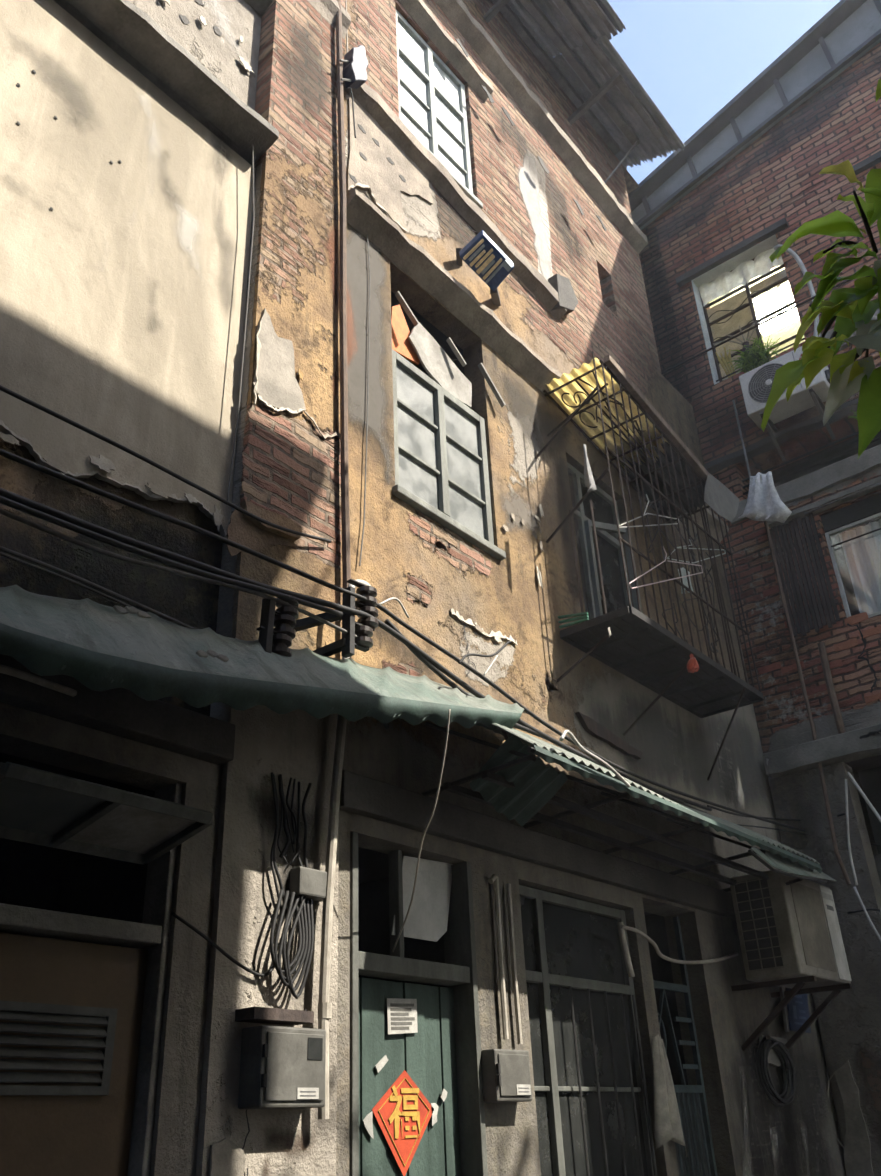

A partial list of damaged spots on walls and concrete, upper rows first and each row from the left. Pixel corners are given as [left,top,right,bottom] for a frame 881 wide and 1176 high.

peeling [162,0,255,74]
peeling [347,97,433,233]
spalling [0,308,340,556]
spalling [406,575,431,606]
spalling [408,513,493,577]
spalling [438,608,563,710]